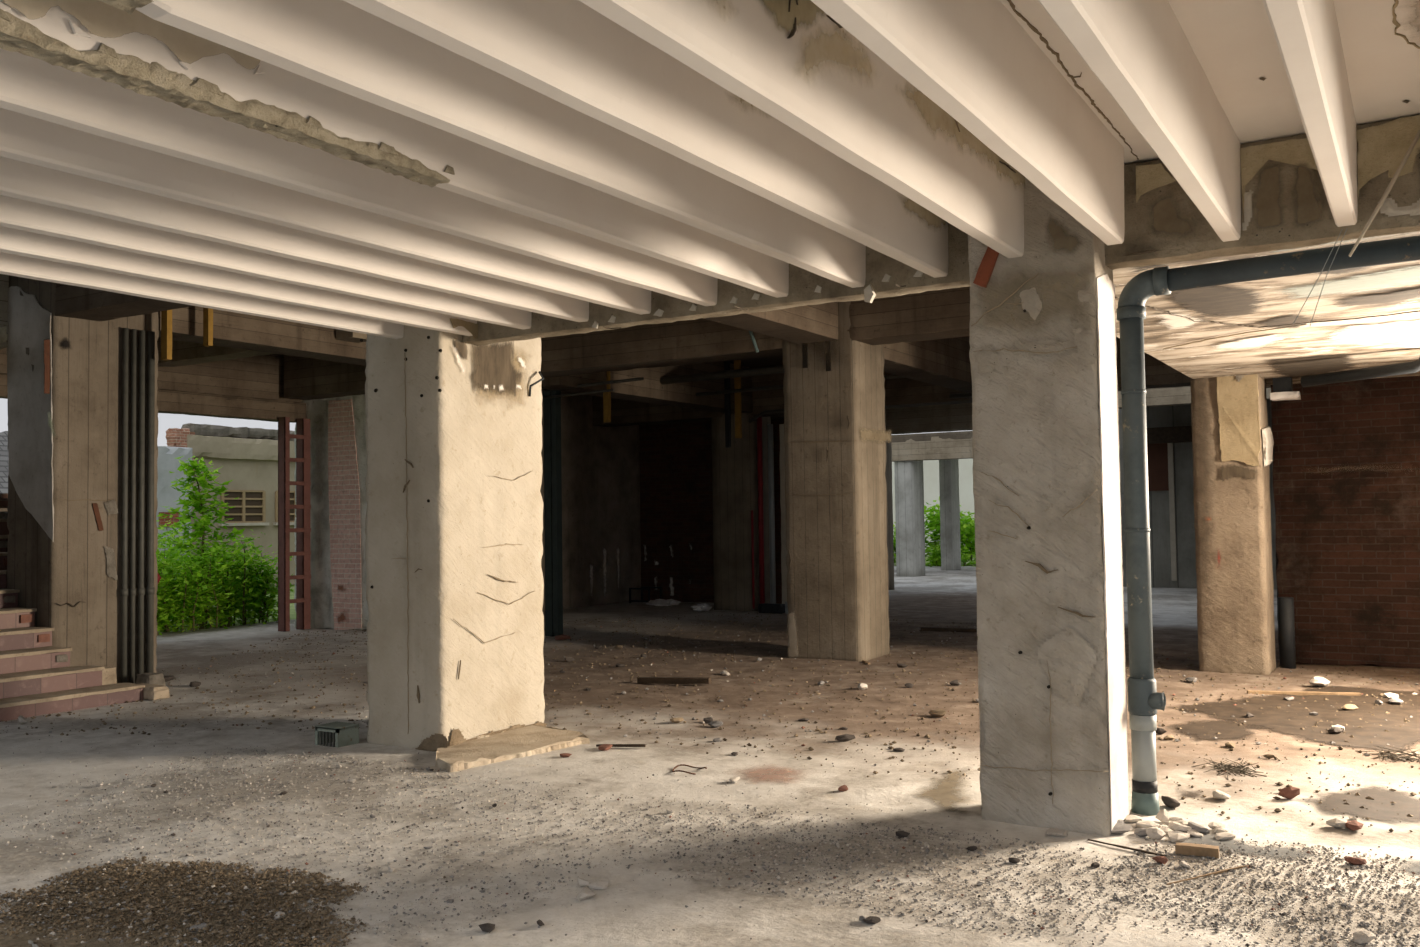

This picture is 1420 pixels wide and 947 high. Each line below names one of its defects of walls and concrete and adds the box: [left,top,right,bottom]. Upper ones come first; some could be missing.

leakage [1392,0,1420,49]
spalling [0,0,455,187]
crack [1007,0,1139,160]
peeling [1356,100,1420,197]
peeling [1135,163,1176,203]
peeling [1240,138,1318,231]
spalling [1378,198,1420,232]
leakage [1164,286,1315,329]
leakage [1337,289,1420,307]